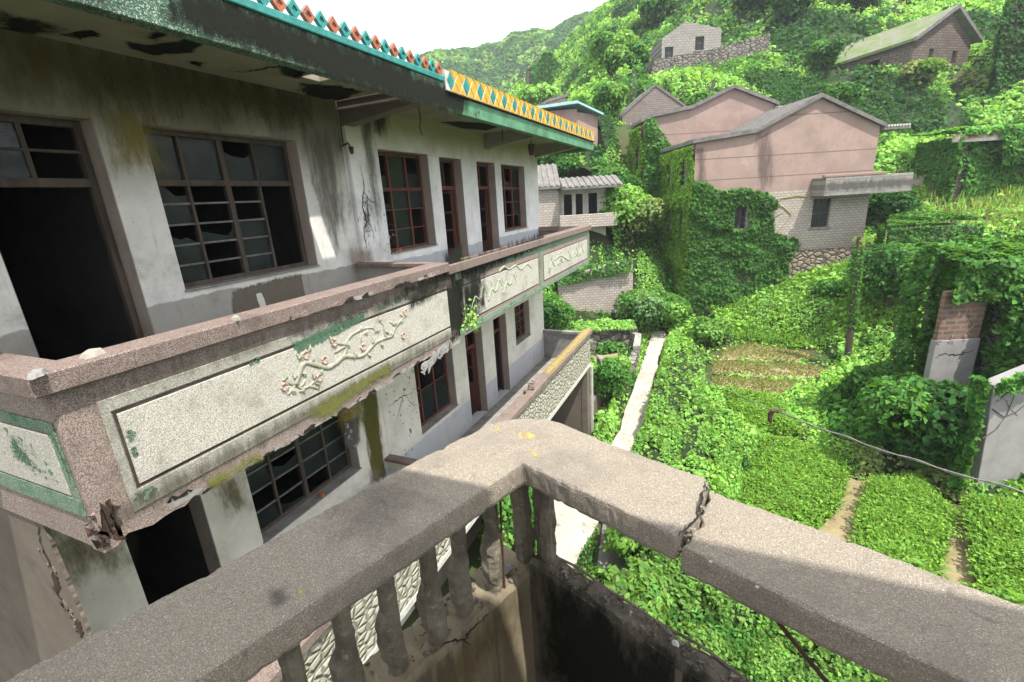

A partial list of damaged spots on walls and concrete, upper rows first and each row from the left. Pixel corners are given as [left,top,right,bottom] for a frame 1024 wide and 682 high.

damp [87,50,312,163]
flaking render [279,66,361,101]
crack [360,167,375,253]
damp [116,388,363,521]
peeling [84,270,452,549]
crack [676,479,710,558]
crack [37,525,84,638]
crack [435,611,493,650]